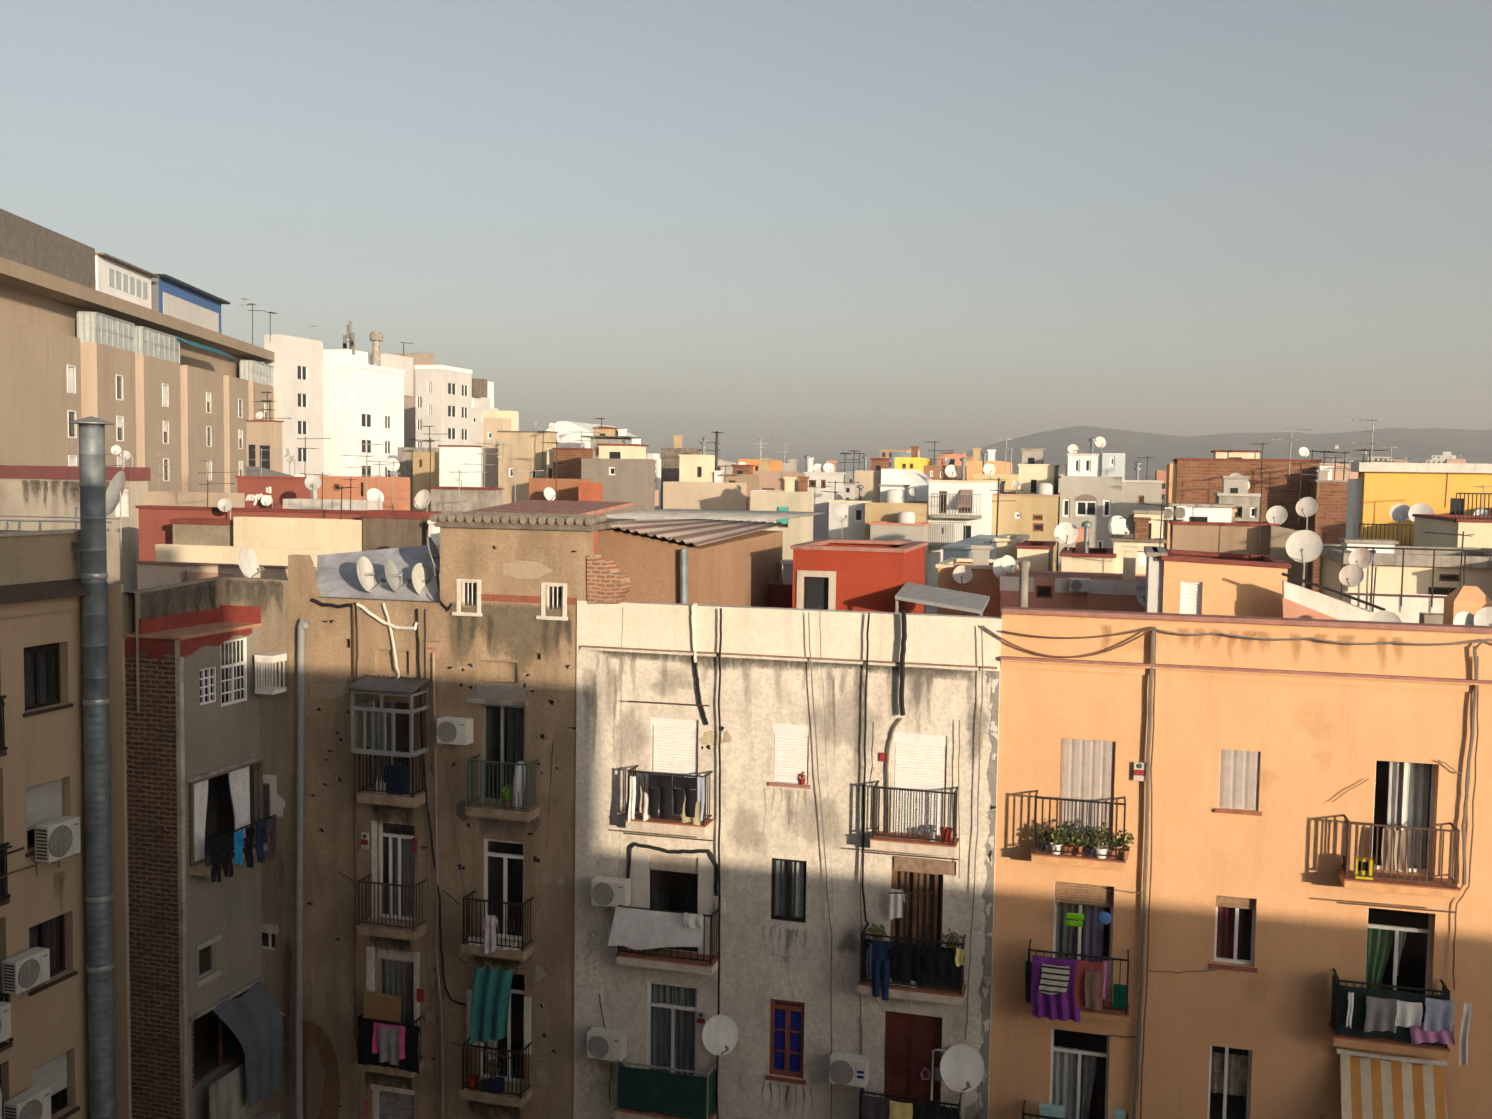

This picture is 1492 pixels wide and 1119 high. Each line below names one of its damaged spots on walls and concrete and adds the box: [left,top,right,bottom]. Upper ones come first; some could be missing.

leakage [22,480,80,502]
leakage [450,604,571,666]
leakage [855,677,865,738]
leakage [969,705,986,752]
peeling [974,671,1000,1119]